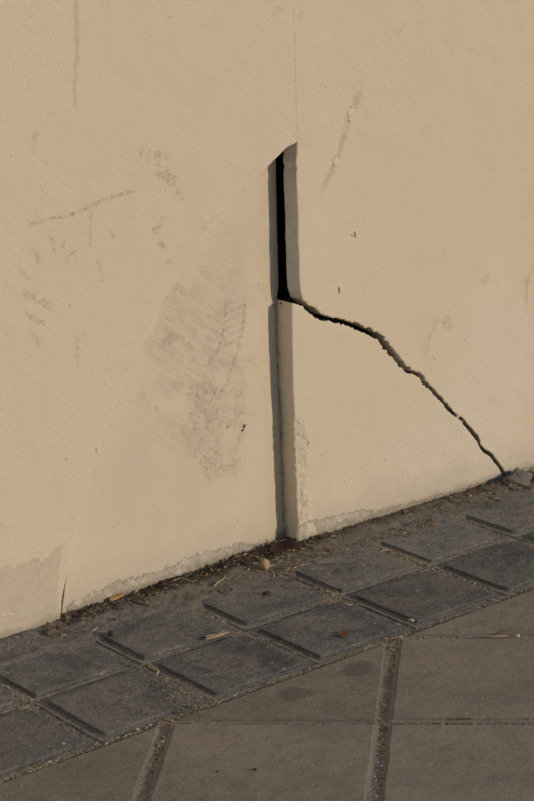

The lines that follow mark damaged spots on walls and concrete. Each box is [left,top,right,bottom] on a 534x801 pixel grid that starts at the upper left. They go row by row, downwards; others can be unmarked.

crack [276,153,506,476]